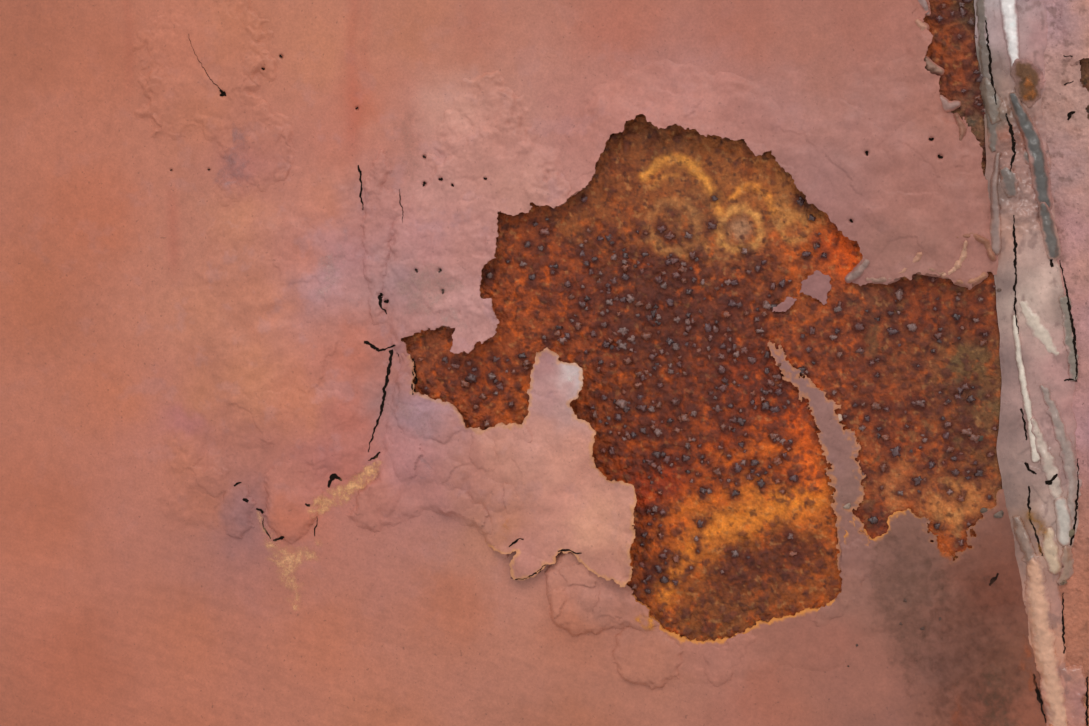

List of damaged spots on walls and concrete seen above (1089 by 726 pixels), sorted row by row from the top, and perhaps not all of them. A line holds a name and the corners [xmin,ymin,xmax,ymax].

corrosion [923,0,986,176]
corrosion [1079,58,1089,92]
crack [356,165,364,210]
crack [364,341,418,461]
peeling [347,0,1024,684]
corrosion [397,114,1002,642]
crack [305,473,342,536]